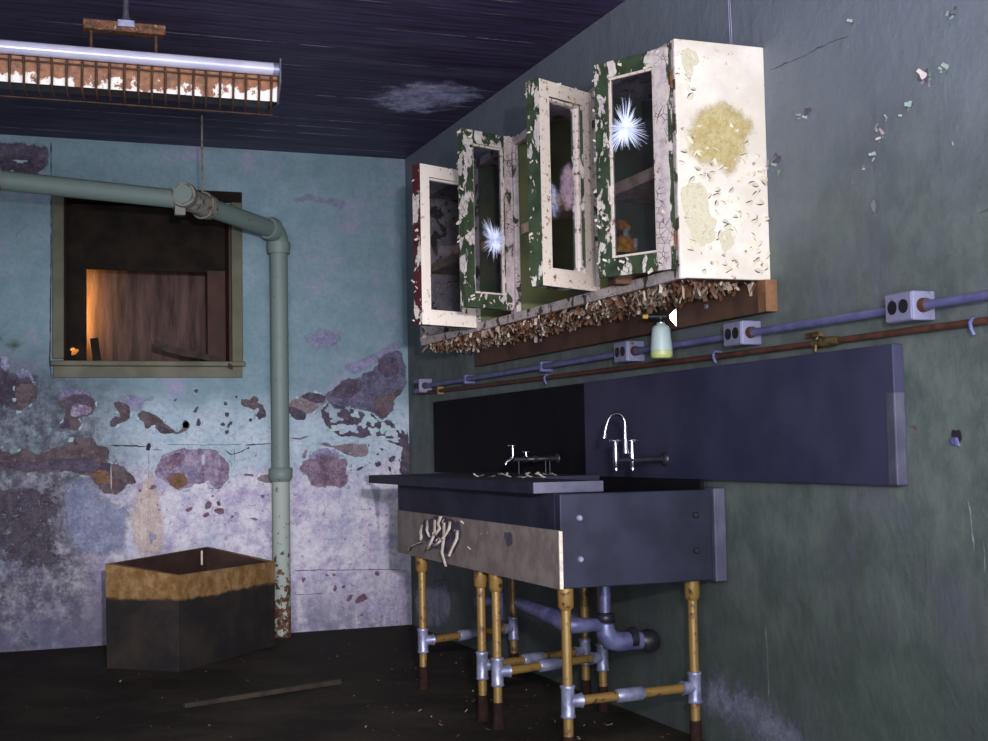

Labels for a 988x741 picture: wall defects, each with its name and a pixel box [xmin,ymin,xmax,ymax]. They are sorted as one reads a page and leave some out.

leakage [0,356,37,418]
peeling [110,387,203,434]
peeling [220,394,266,435]
flaking render [289,390,410,489]
peeling [151,444,234,518]
peeling [244,474,272,483]
leakage [0,479,129,568]